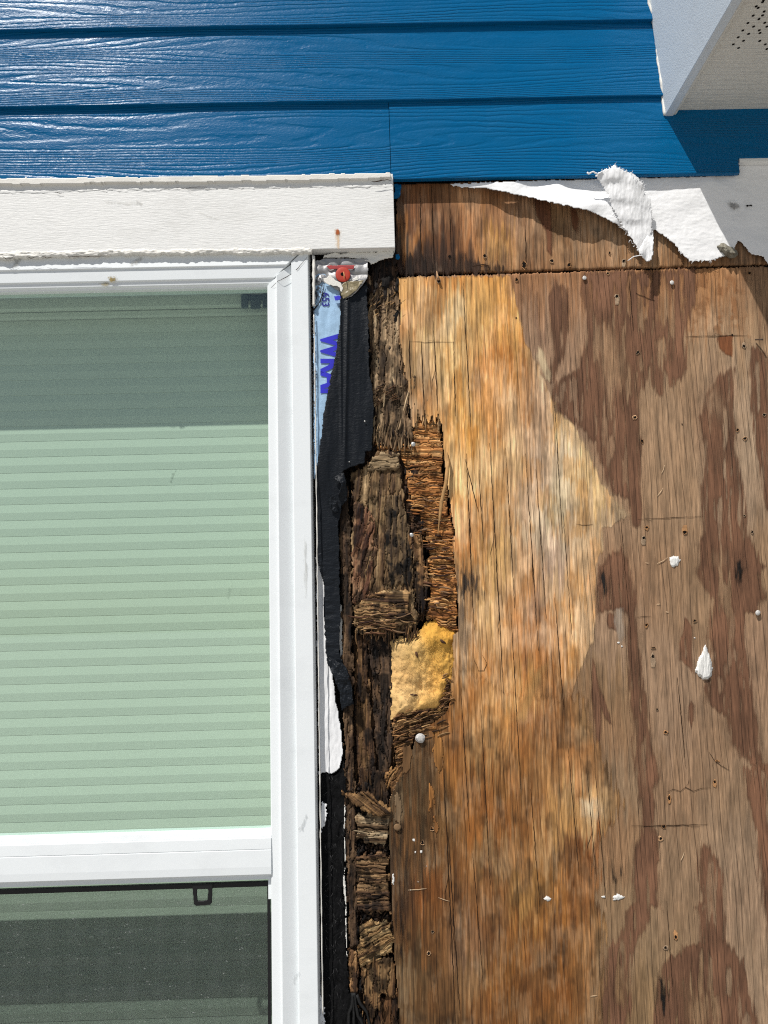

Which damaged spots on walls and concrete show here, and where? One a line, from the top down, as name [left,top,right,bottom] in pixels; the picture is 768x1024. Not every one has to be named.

peeling [367,452,400,472]
peeling [348,502,418,645]
damp [389,253,695,1024]
damp [697,335,768,924]
peeling [385,763,403,794]
damp [653,844,757,1024]